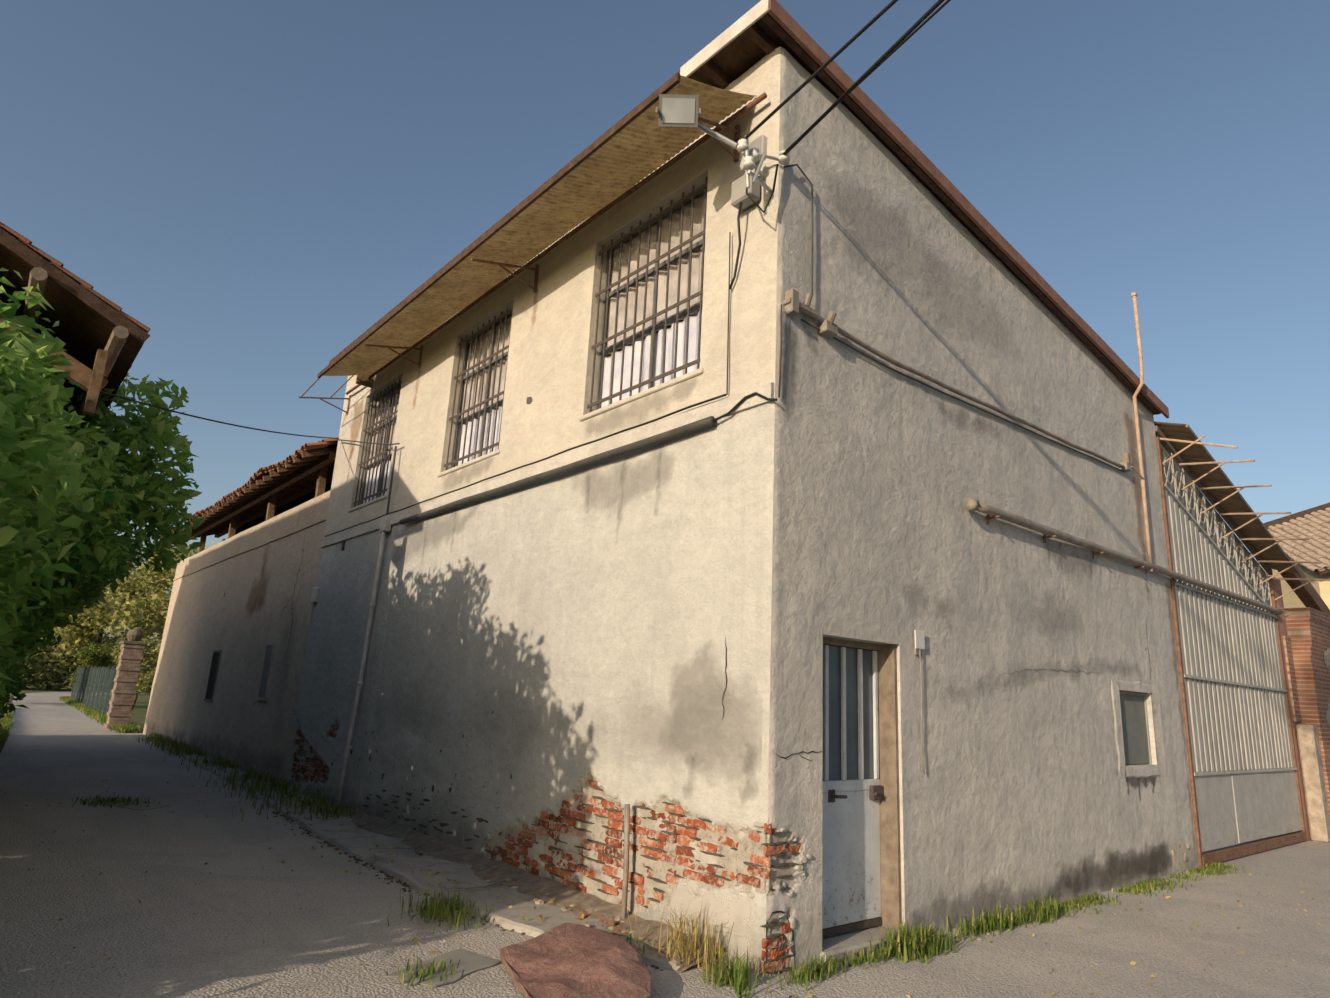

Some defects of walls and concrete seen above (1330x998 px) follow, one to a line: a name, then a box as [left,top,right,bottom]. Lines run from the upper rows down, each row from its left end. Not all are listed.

crack [720,638,728,719]
spalling [289,717,340,791]
crack [775,751,822,761]
spalling [350,723,812,975]
water stain [1050,845,1170,898]